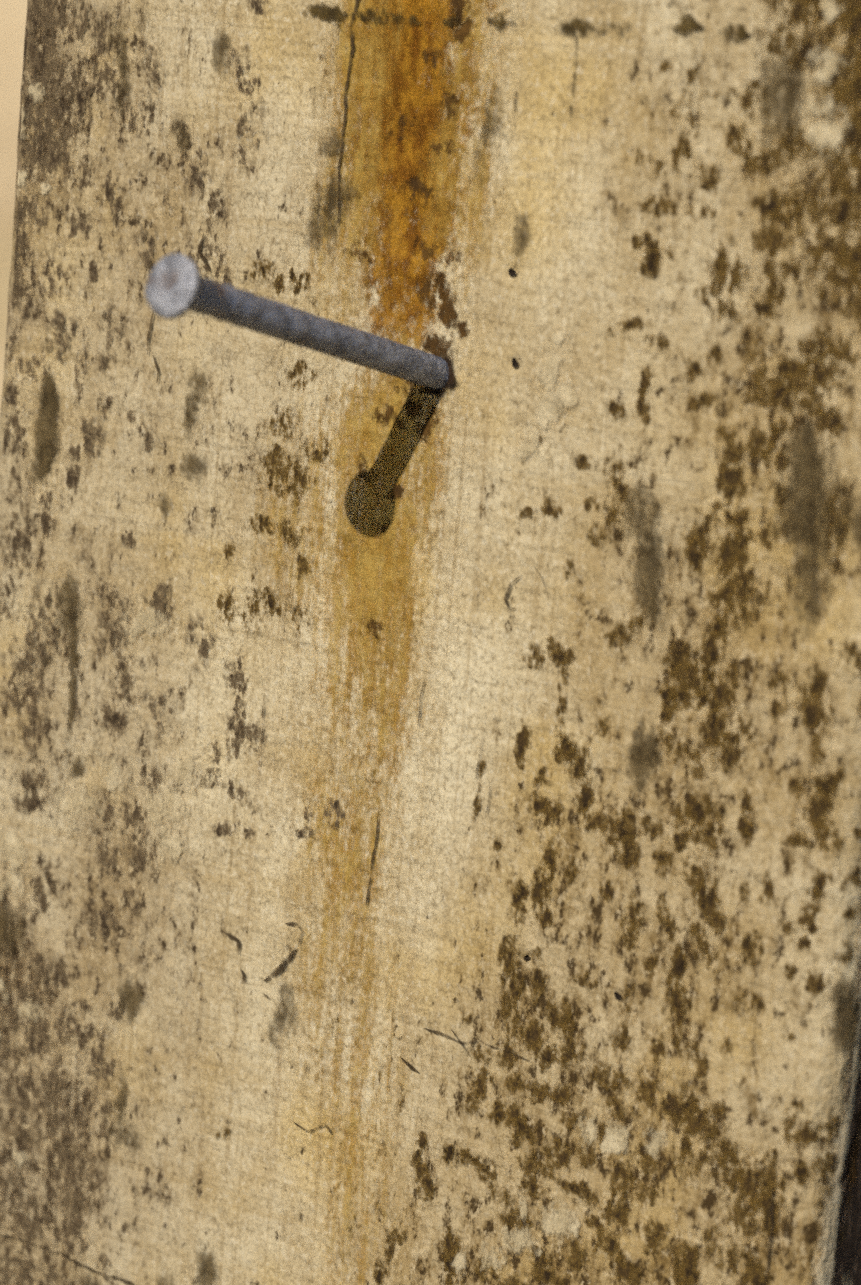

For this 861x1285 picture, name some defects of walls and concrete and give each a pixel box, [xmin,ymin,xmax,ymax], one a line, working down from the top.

crack [302,0,515,223]
crack [553,17,631,122]
crack [672,13,751,42]
water stain [308,175,356,243]
rust [319,0,495,360]
rust [328,374,443,742]
water stain [441,0,861,1285]
water stain [410,1131,434,1201]
crack [0,1235,134,1285]
water stain [373,1228,406,1285]